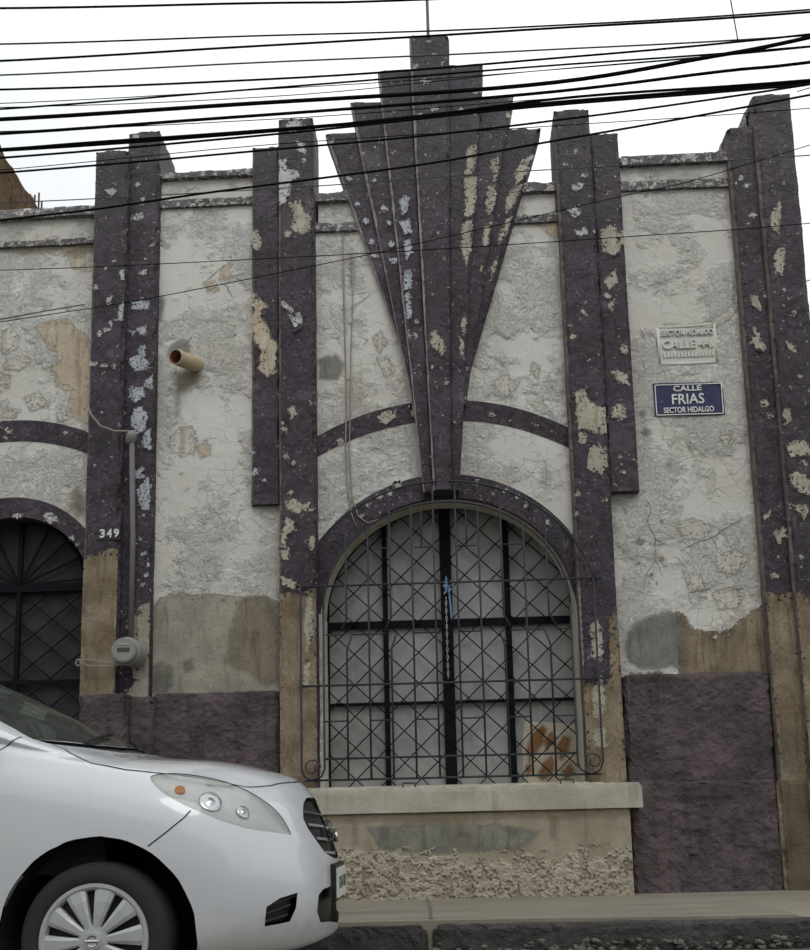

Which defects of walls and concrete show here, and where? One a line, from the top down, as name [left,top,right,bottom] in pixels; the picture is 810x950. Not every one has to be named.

peeling [460,144,534,265]
peeling [568,206,624,257]
spalling [0,295,153,450]
spalling [252,293,278,377]
peeling [573,384,627,475]
peeling [135,466,152,510]
peeling [278,490,314,560]
peeling [786,438,810,521]
water stain [228,598,279,684]
flaking render [584,611,666,783]
flaking render [675,570,810,780]
corrosion [526,726,574,779]